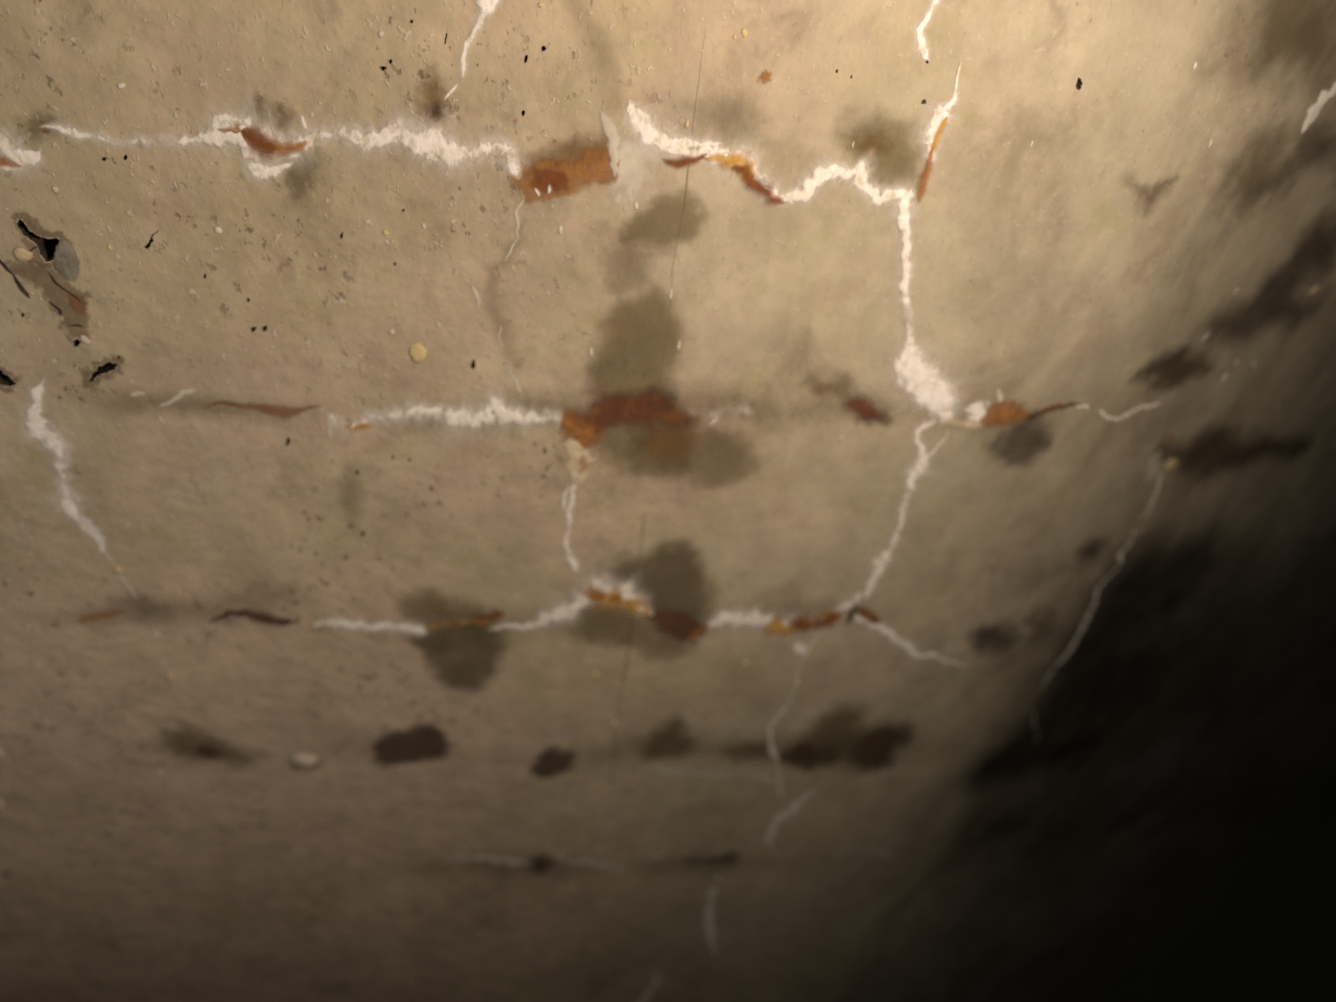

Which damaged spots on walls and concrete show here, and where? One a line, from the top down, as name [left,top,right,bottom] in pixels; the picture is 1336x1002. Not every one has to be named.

crack [0,0,525,261]
corrosion [515,142,618,201]
leakage [601,102,722,203]
spalling [0,219,91,347]
spalling [0,370,17,386]
crack [26,379,137,599]
crack [314,286,653,635]
corrosion [558,391,691,456]
leakage [594,295,676,397]
corrosion [848,399,884,422]
crack [663,62,1165,860]
leakage [375,725,448,764]